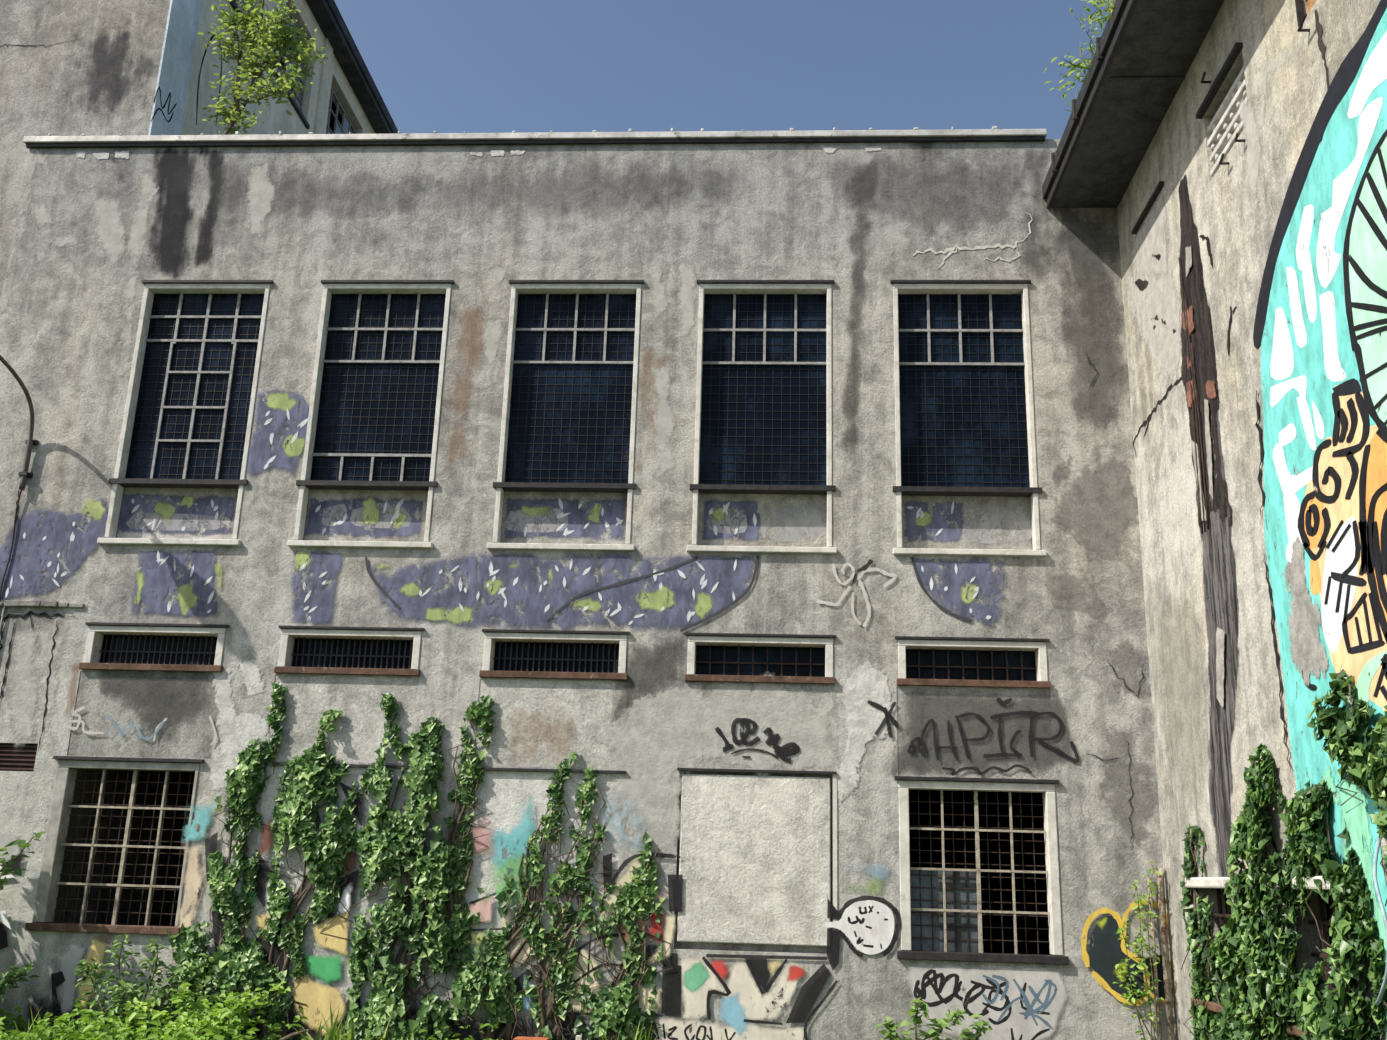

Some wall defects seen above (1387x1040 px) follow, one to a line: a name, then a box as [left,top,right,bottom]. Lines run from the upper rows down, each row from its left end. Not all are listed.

damp [88,33,152,111]
damp [15,148,79,247]
damp [93,147,223,375]
damp [246,164,275,237]
damp [851,168,876,328]
crack [913,212,1033,268]
damp [844,353,858,443]
crack [0,599,77,754]
damp [101,670,202,728]